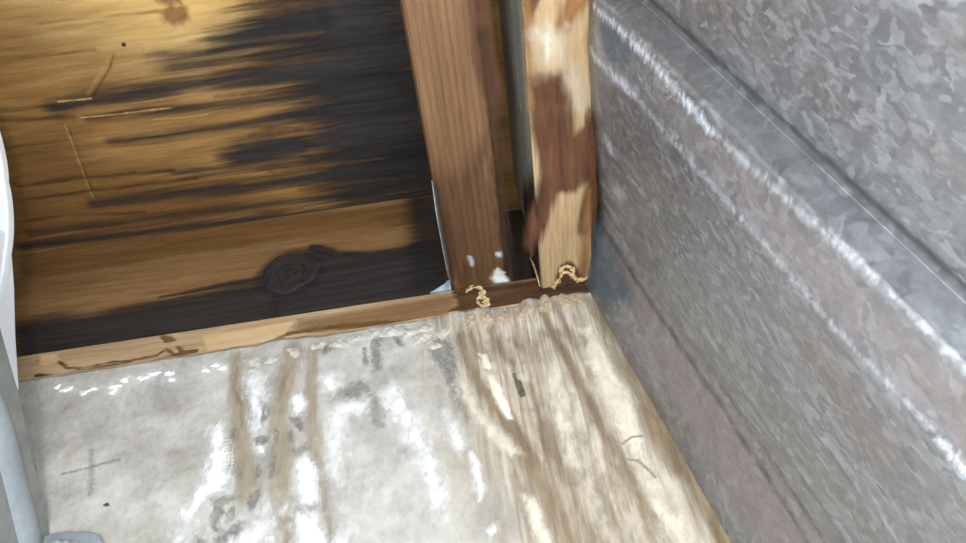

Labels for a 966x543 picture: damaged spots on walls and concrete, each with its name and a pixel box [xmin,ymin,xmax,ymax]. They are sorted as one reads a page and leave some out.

damp [4,0,731,543]